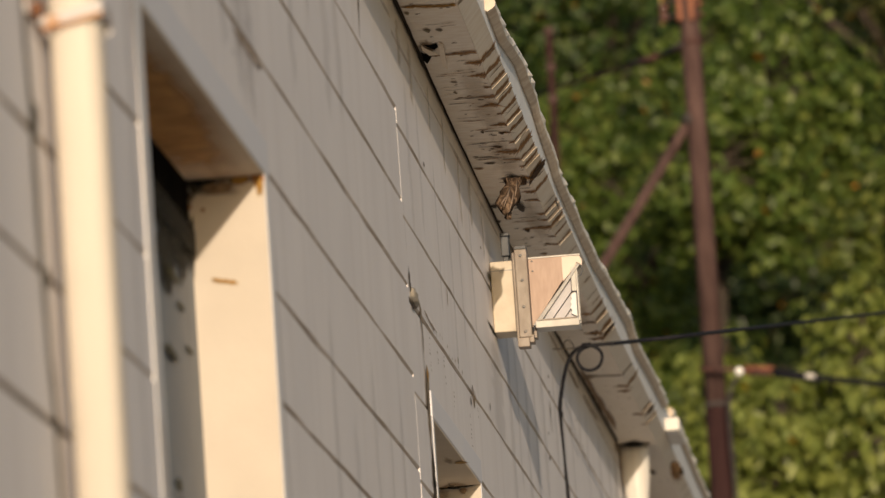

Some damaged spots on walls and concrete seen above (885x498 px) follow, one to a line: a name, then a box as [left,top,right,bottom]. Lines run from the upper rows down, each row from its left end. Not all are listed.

peeling [421,29,549,201]
peeling [514,198,573,255]
peeling [580,298,616,342]
mould [165,344,178,361]
spalling [670,461,684,479]